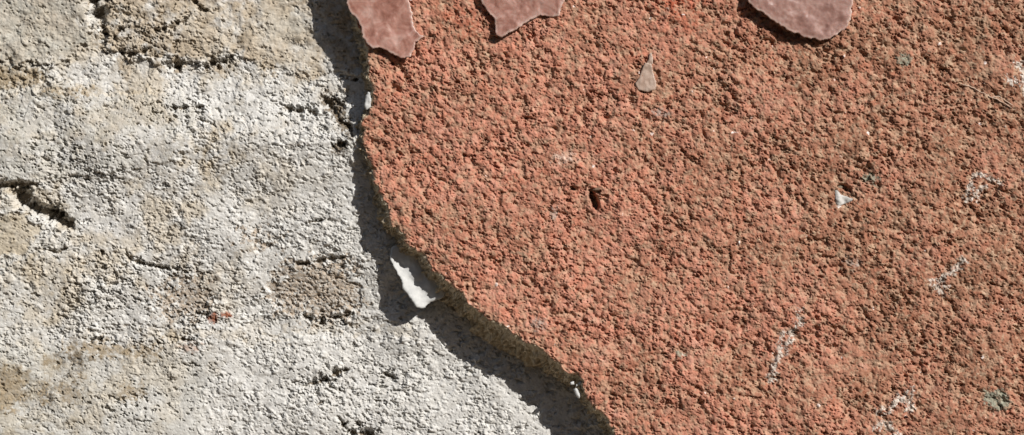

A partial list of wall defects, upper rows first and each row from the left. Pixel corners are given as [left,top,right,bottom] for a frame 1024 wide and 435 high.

spalling [347,0,615,435]
spalling [138,270,216,325]
spalling [231,223,372,331]